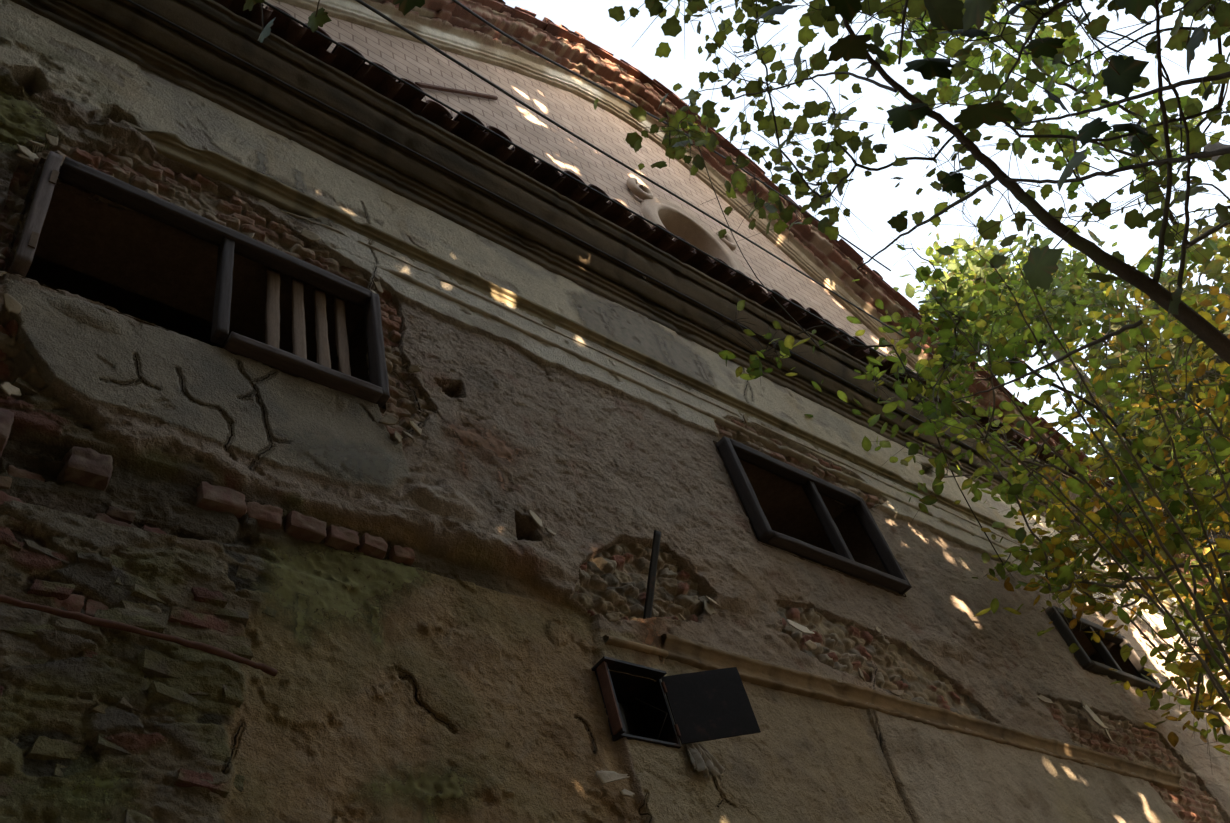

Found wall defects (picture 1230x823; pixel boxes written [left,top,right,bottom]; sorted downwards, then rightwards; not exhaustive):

spalling [0,133,434,444]
crack [100,354,289,470]
spalling [570,542,721,622]